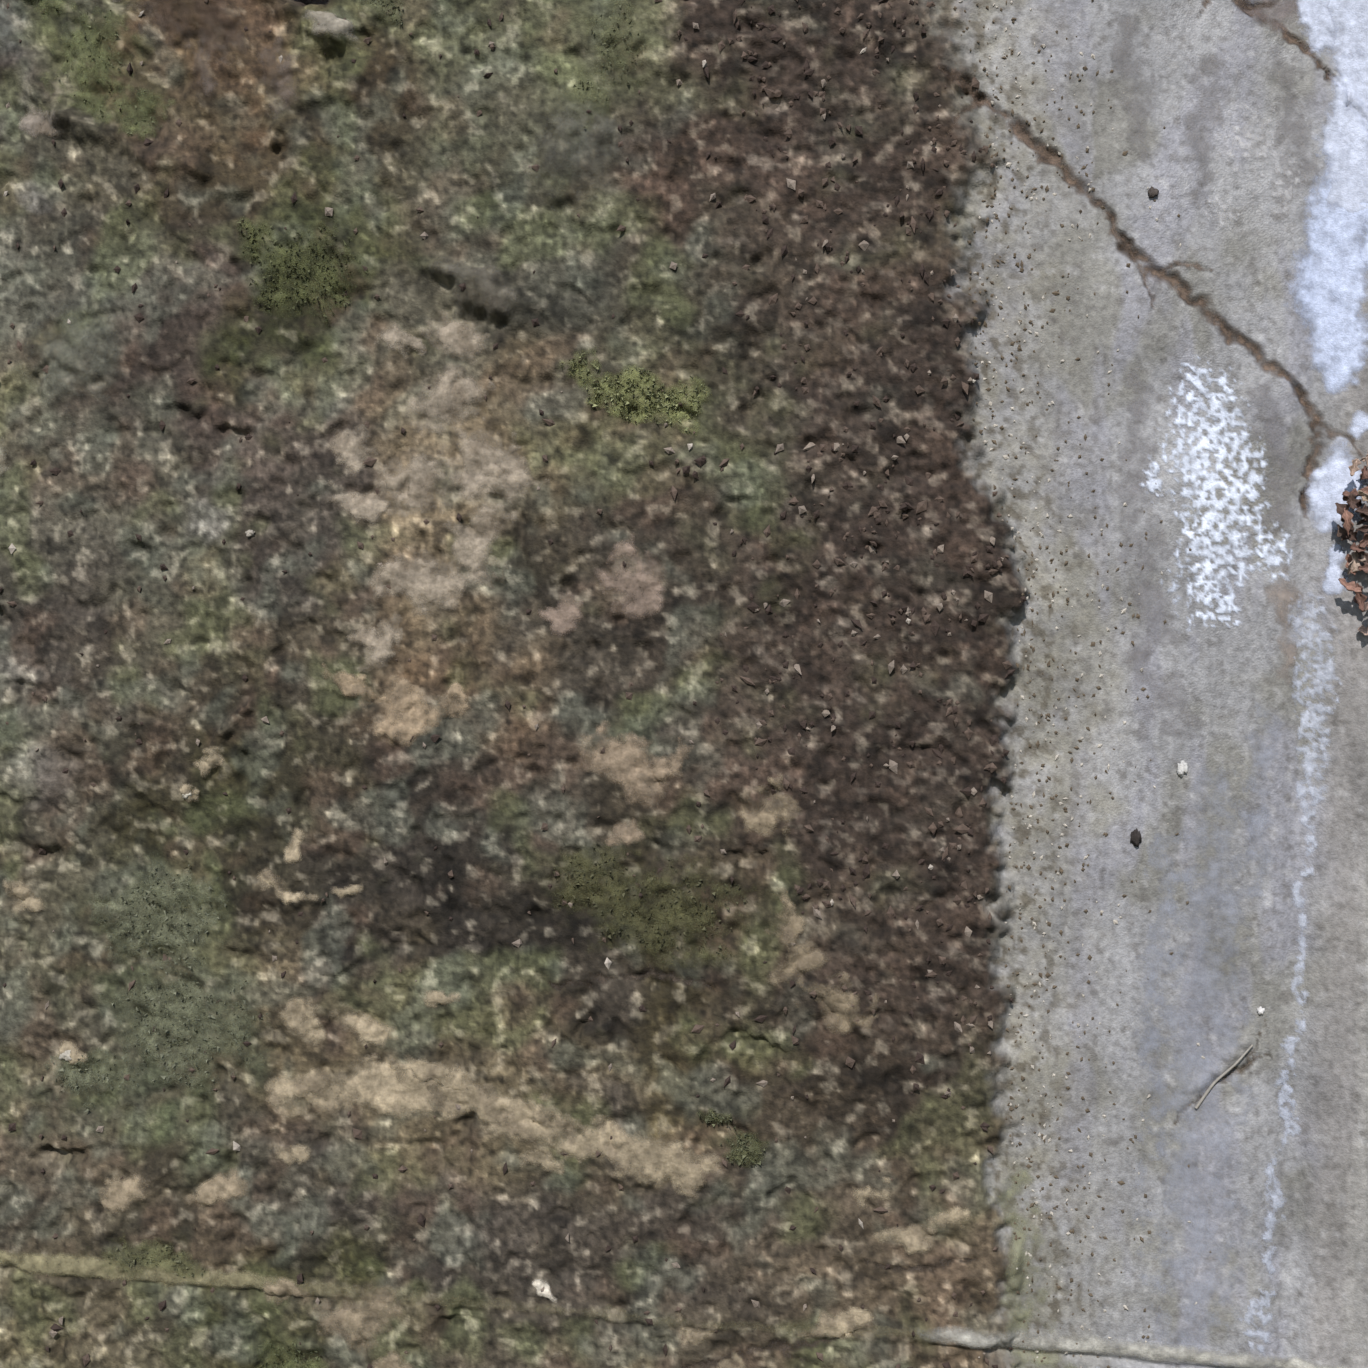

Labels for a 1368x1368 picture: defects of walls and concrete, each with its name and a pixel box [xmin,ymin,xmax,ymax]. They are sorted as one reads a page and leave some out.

crack [938,67,1362,515]
crack [1203,0,1335,82]
leakage [1225,0,1368,393]
leakage [1141,363,1292,626]